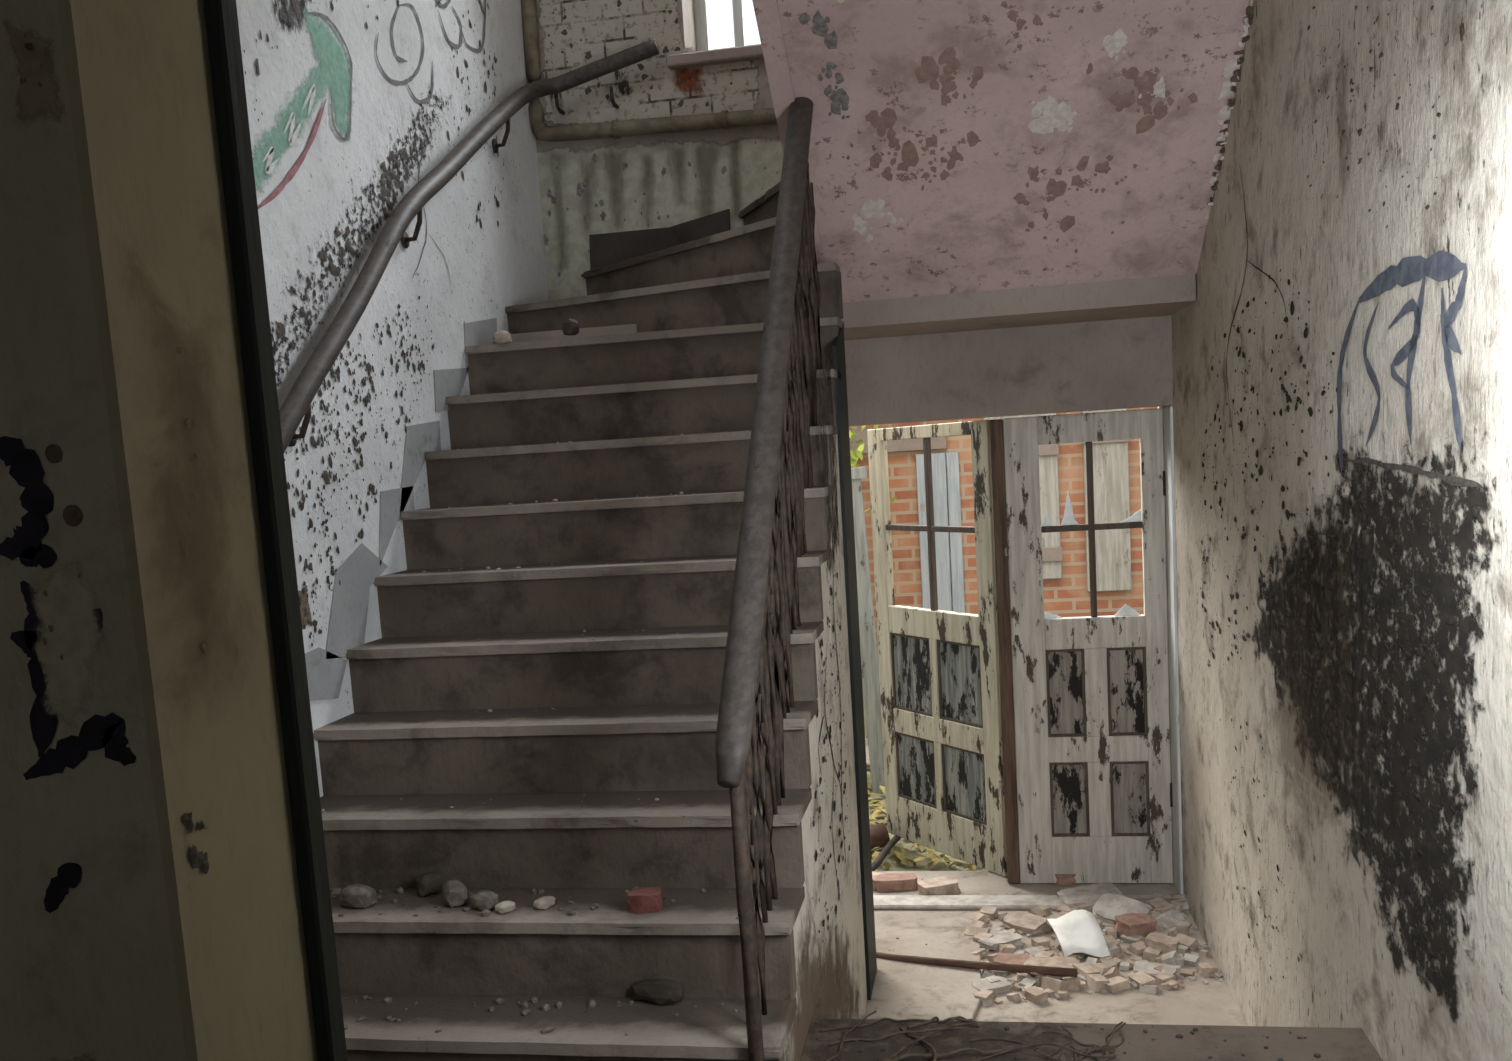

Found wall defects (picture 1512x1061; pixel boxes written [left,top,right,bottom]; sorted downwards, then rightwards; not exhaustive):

peeling [244,0,312,76]
water stain [914,46,983,106]
water stain [1000,1,1043,31]
peeling [270,1,497,393]
peeling [476,127,504,228]
spalling [284,296,434,647]
water stain [1252,430,1502,1023]